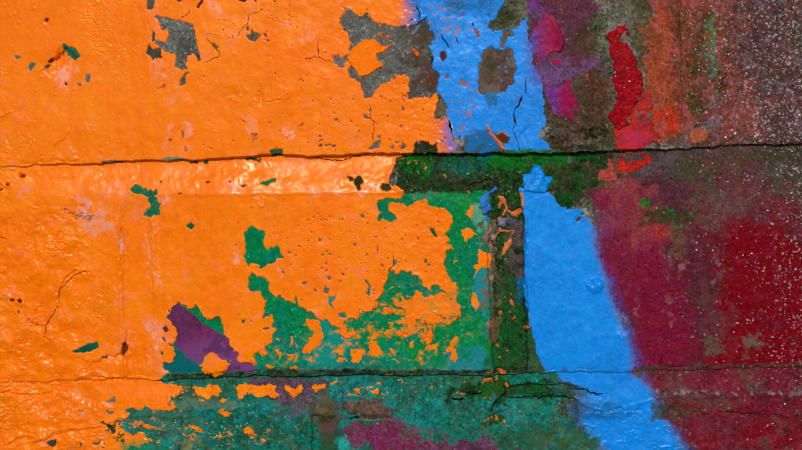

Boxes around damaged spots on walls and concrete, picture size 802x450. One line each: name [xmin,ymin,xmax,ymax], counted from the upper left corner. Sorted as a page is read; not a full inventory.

spalling [63,43,80,60]
peeling [147,0,220,86]
peeling [333,8,449,119]
peeling [473,0,564,94]
peeling [390,141,437,170]
peeling [486,124,509,150]
crack [512,77,527,150]
peeling [102,165,553,449]
crack [451,383,603,417]